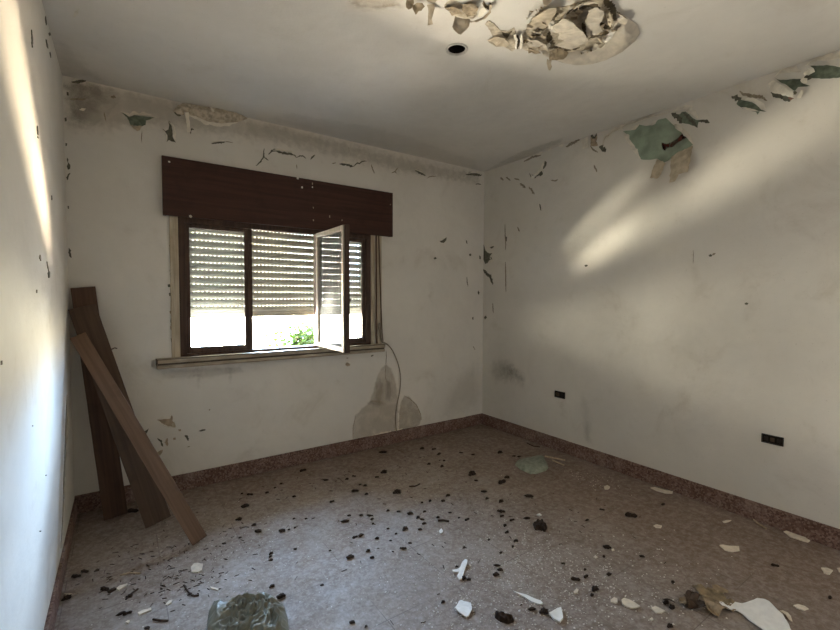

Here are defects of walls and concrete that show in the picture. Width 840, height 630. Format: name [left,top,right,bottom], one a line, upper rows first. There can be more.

peeling [406,0,640,70]
peeling [731,51,840,115]
peeling [121,111,157,142]
peeling [162,121,176,142]
peeling [606,105,700,183]
peeling [157,414,190,456]